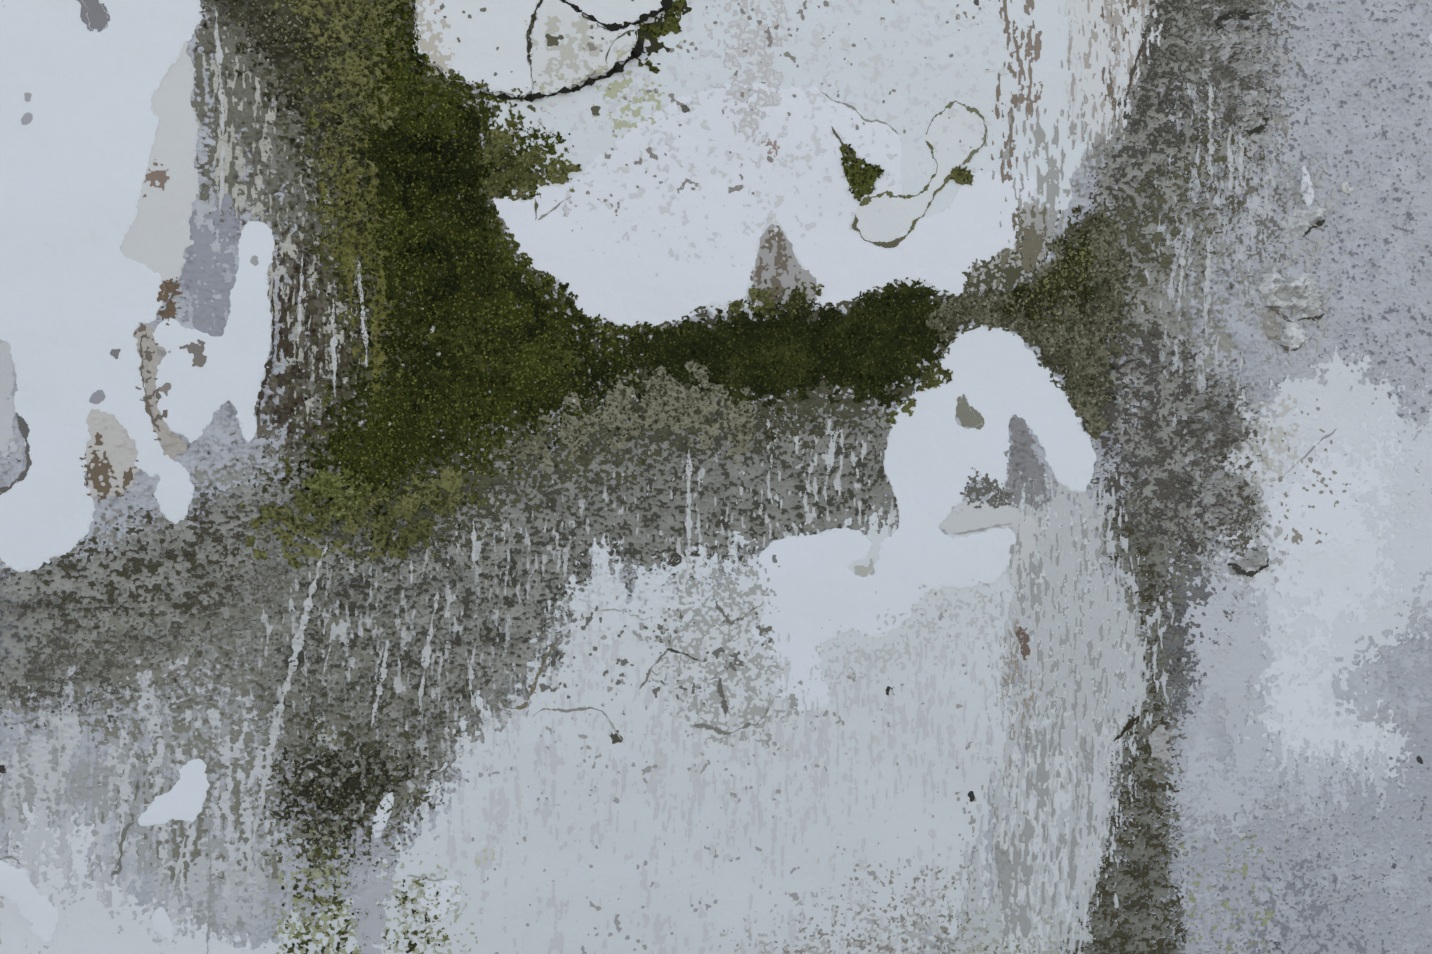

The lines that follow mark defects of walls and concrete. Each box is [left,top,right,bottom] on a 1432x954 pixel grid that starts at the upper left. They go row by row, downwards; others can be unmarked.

peeling [110,324,207,460]
leakage [177,191,240,337]
peeling [120,27,375,442]
leakage [254,86,403,477]
crack [486,0,673,102]
spalling [707,220,831,316]
leakage [750,226,801,301]
peeling [487,0,1163,299]
leakage [968,205,1048,287]
peeling [1143,75,1326,427]
peeling [0,339,1432,954]
leakage [473,544,1109,954]